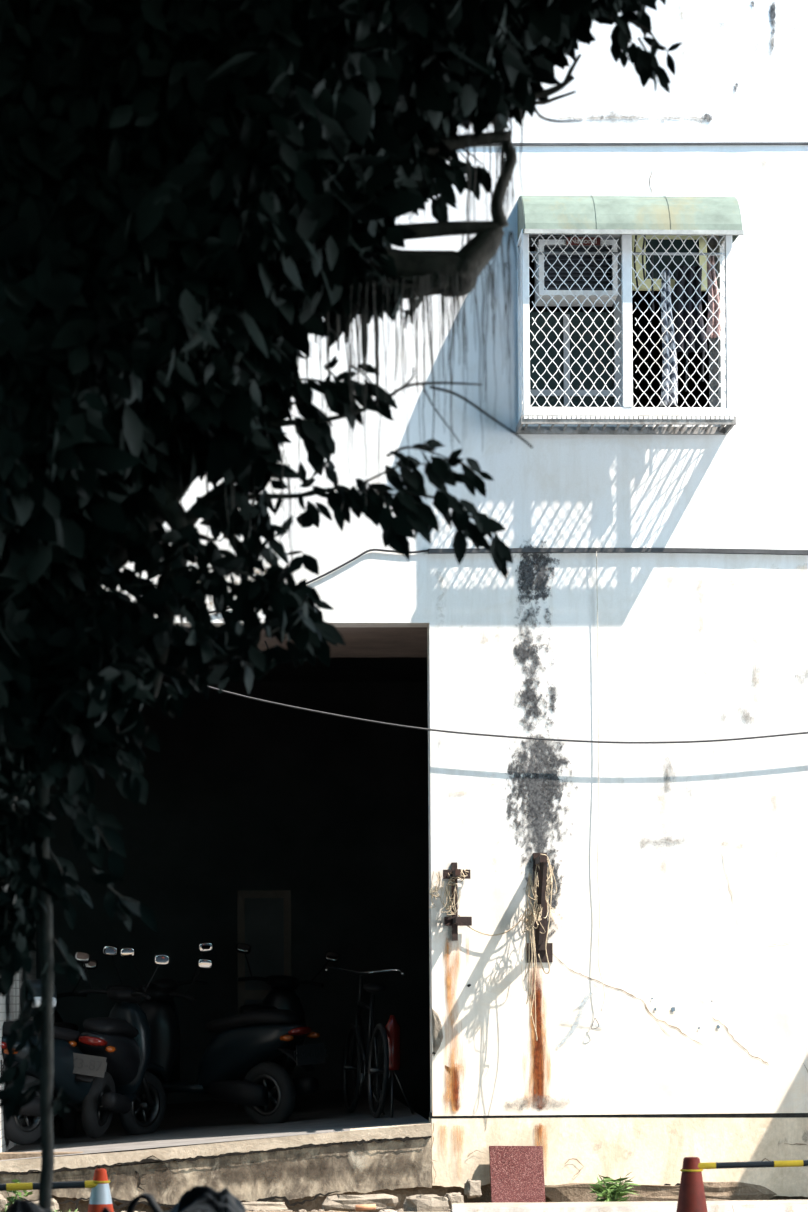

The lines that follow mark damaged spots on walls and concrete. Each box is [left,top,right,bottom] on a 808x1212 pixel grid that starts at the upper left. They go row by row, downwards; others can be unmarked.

damp [507,541,577,939]
corrosion [447,942,469,1112]
corrosion [531,970,551,1109]
crack [556,957,769,1065]